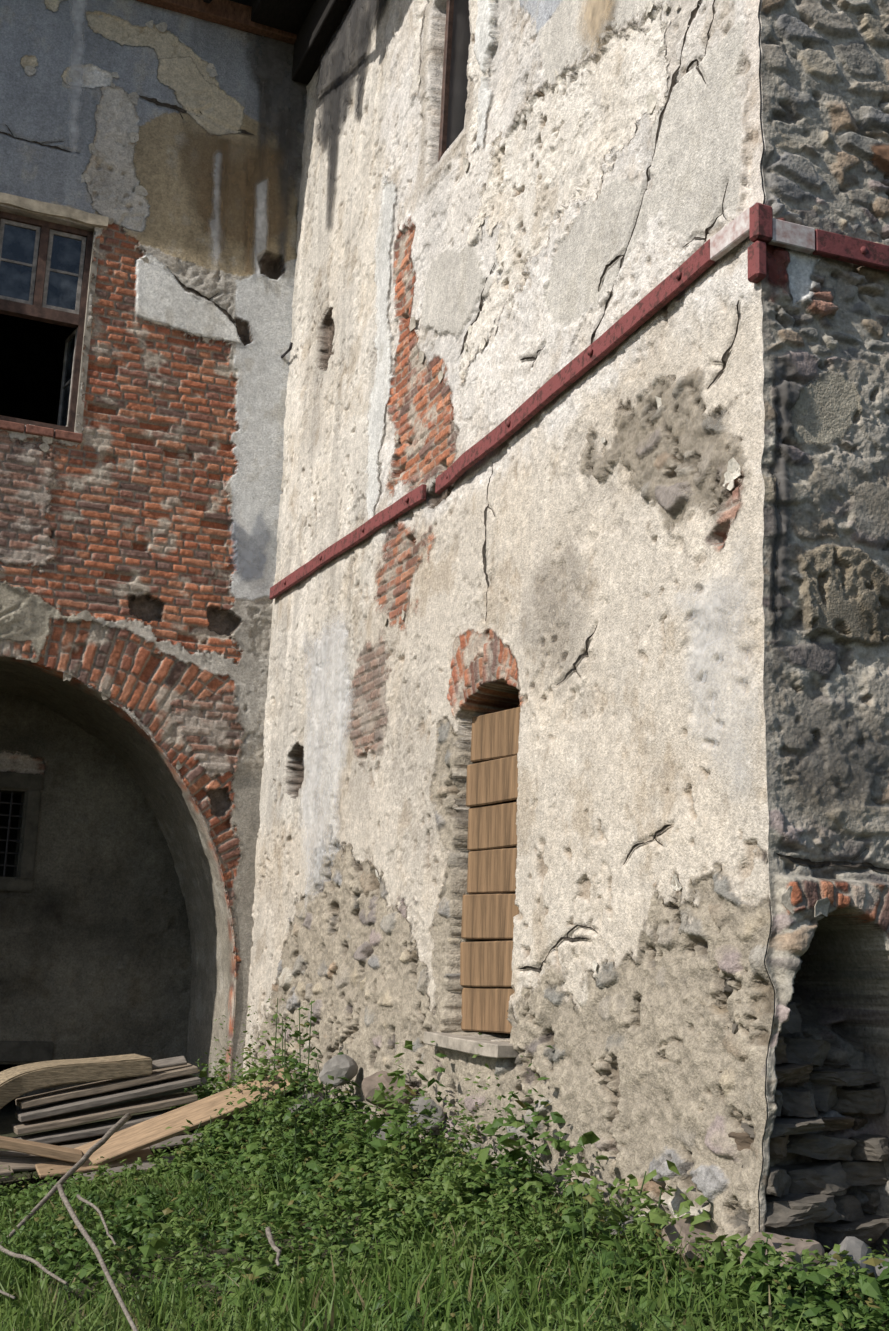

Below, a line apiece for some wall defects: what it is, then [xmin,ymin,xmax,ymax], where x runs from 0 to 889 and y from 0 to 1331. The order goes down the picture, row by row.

peeling [85,11,244,135]
water stain [584,0,612,36]
peeling [737,0,764,213]
peeling [386,0,680,493]
crack [591,0,715,344]
crack [683,183,728,248]
corrosion [766,244,790,286]
flaking render [0,64,244,978]
crack [482,463,495,621]
flaking render [706,471,744,550]
crack [623,825,671,865]
crack [518,925,598,971]